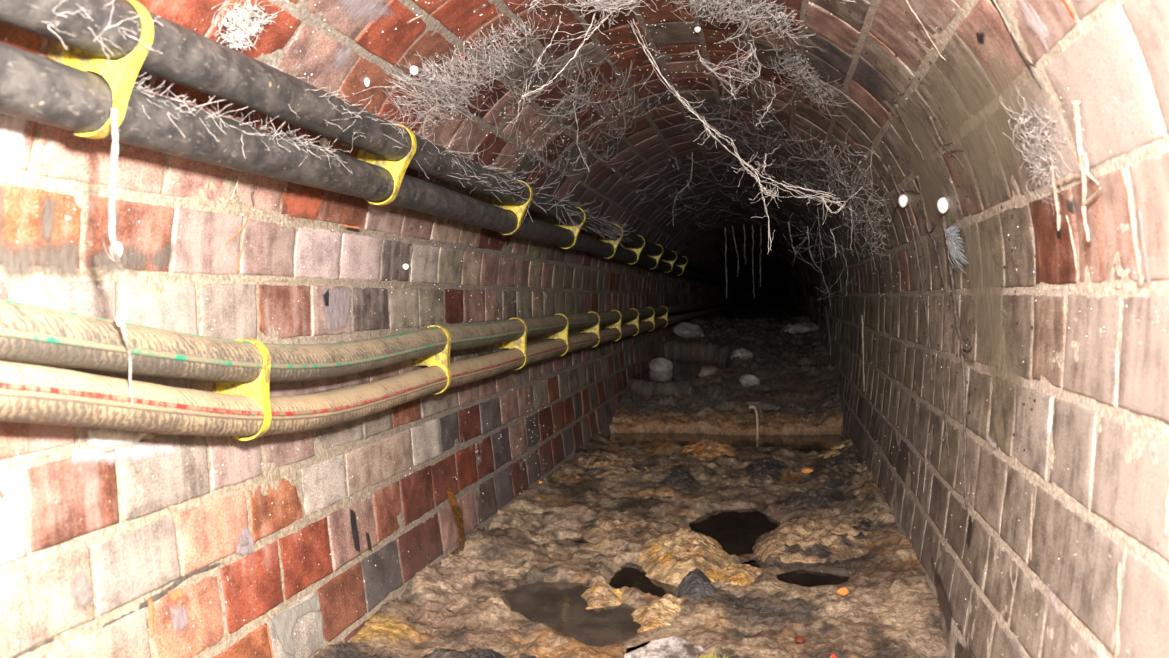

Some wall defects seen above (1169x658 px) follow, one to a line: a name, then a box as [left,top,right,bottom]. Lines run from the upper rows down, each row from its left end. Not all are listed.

leakage [1089,562,1121,658]